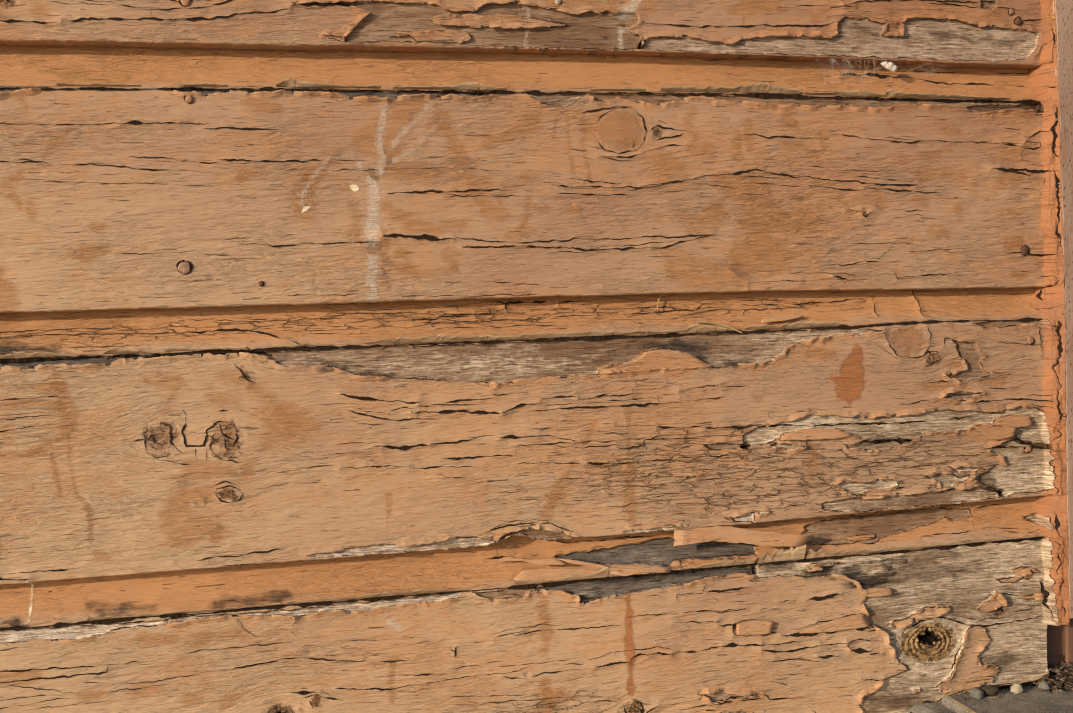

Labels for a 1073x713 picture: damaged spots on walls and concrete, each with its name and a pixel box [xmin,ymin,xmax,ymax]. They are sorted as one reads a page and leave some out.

peeling [292,0,1040,62]
crack [0,578,901,713]
peeling [0,319,1059,713]
crack [266,0,1067,685]